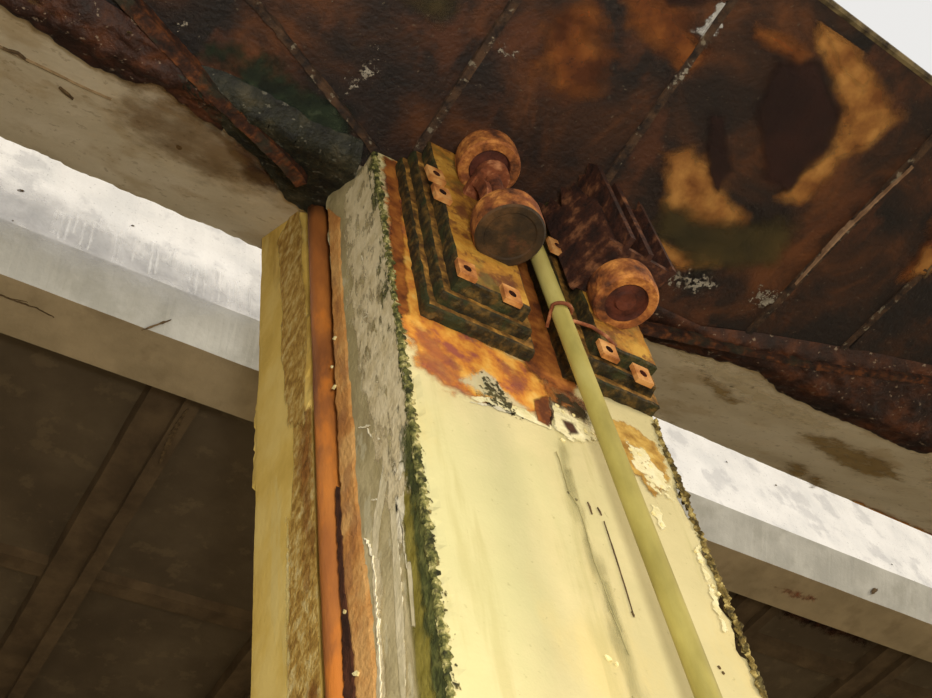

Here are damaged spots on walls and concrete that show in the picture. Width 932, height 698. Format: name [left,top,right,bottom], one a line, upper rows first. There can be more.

crack [0,45,112,100]
corrosion [546,5,605,94]
corrosion [630,0,709,69]
leakage [132,101,279,190]
crack [0,294,54,318]
corrosion [382,156,590,424]
corrosion [662,243,717,294]
corrosion [287,204,344,698]
spalling [461,371,597,443]
leakage [678,351,899,480]
leakage [789,464,821,488]
peeling [612,418,768,698]